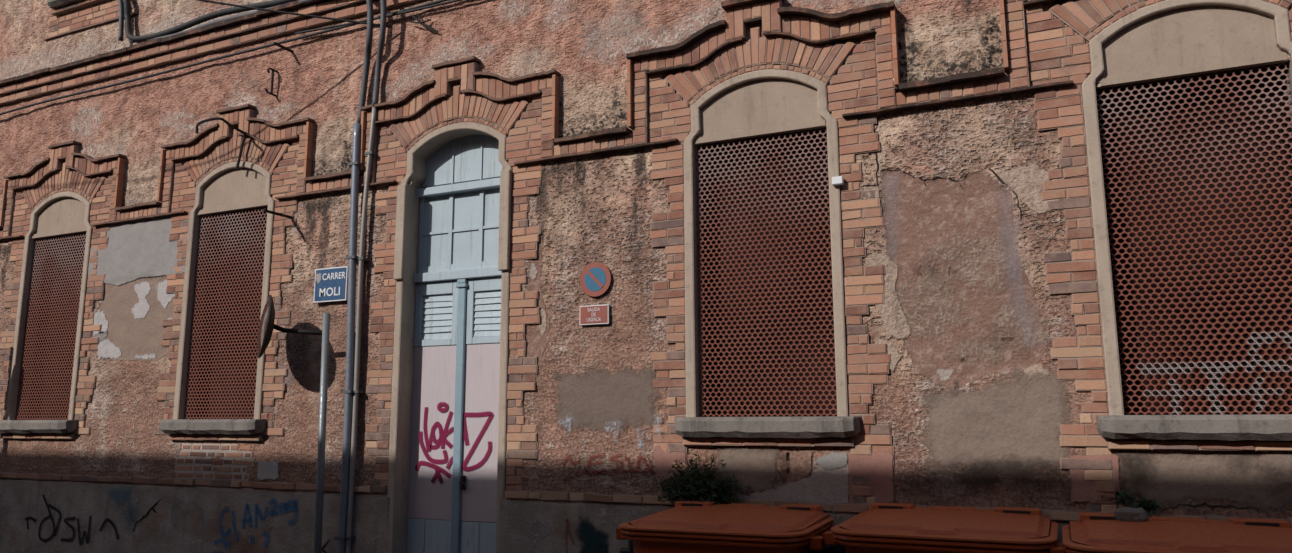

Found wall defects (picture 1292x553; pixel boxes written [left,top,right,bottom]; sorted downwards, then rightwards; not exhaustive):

water stain [898,18,1002,83]
peeling [93,276,180,361]
flaking render [882,170,1050,391]